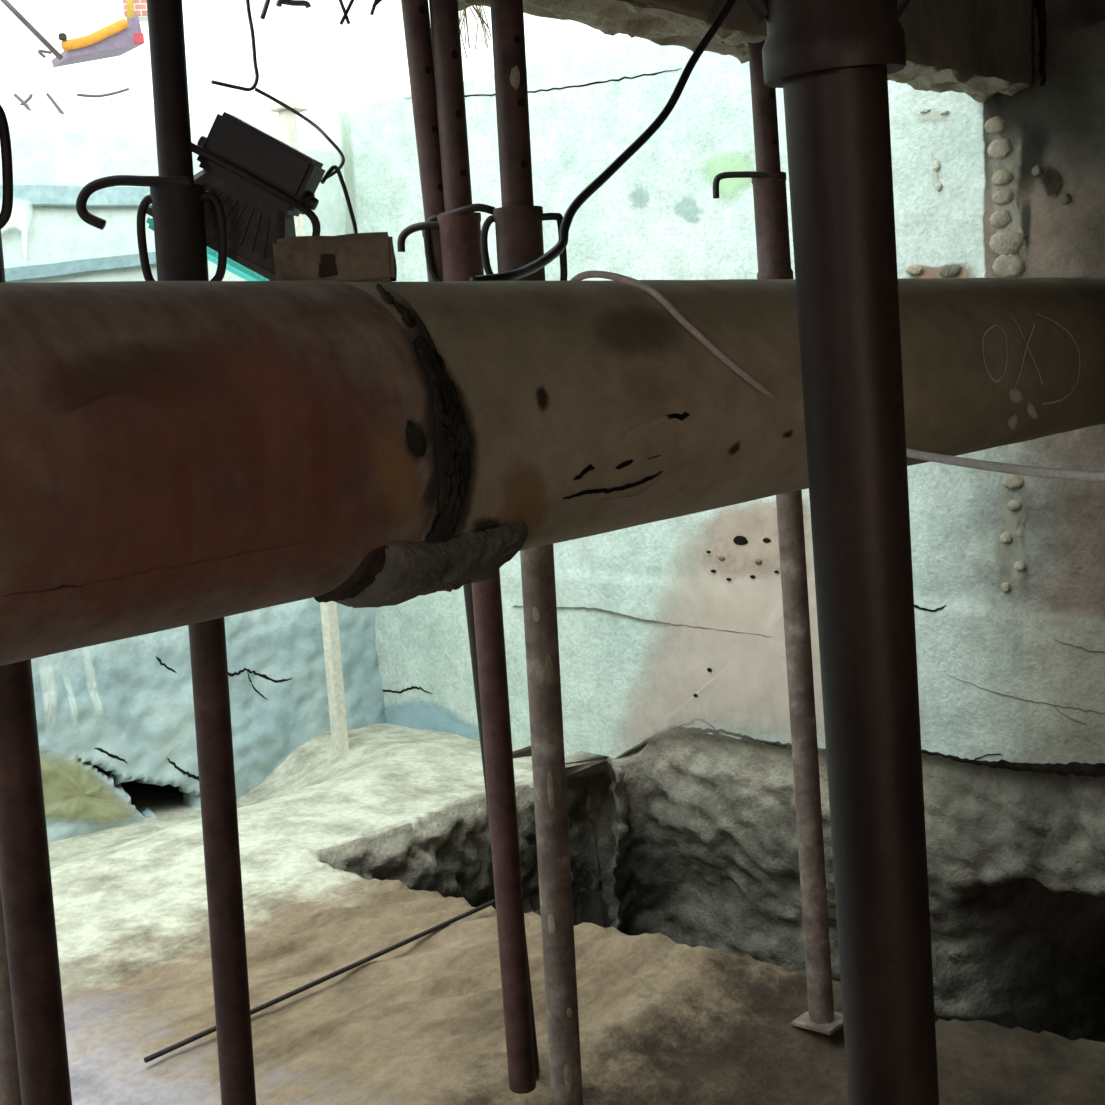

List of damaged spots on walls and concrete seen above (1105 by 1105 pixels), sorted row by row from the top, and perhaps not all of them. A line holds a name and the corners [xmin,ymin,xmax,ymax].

crack [666,412,690,421]
crack [563,455,663,499]
crack [557,607,771,637]
crack [1053,639,1105,653]
crack [156,656,176,673]
crack [228,667,292,699]
crack [95,748,127,763]
crack [167,758,199,781]
spalling [120,780,183,795]